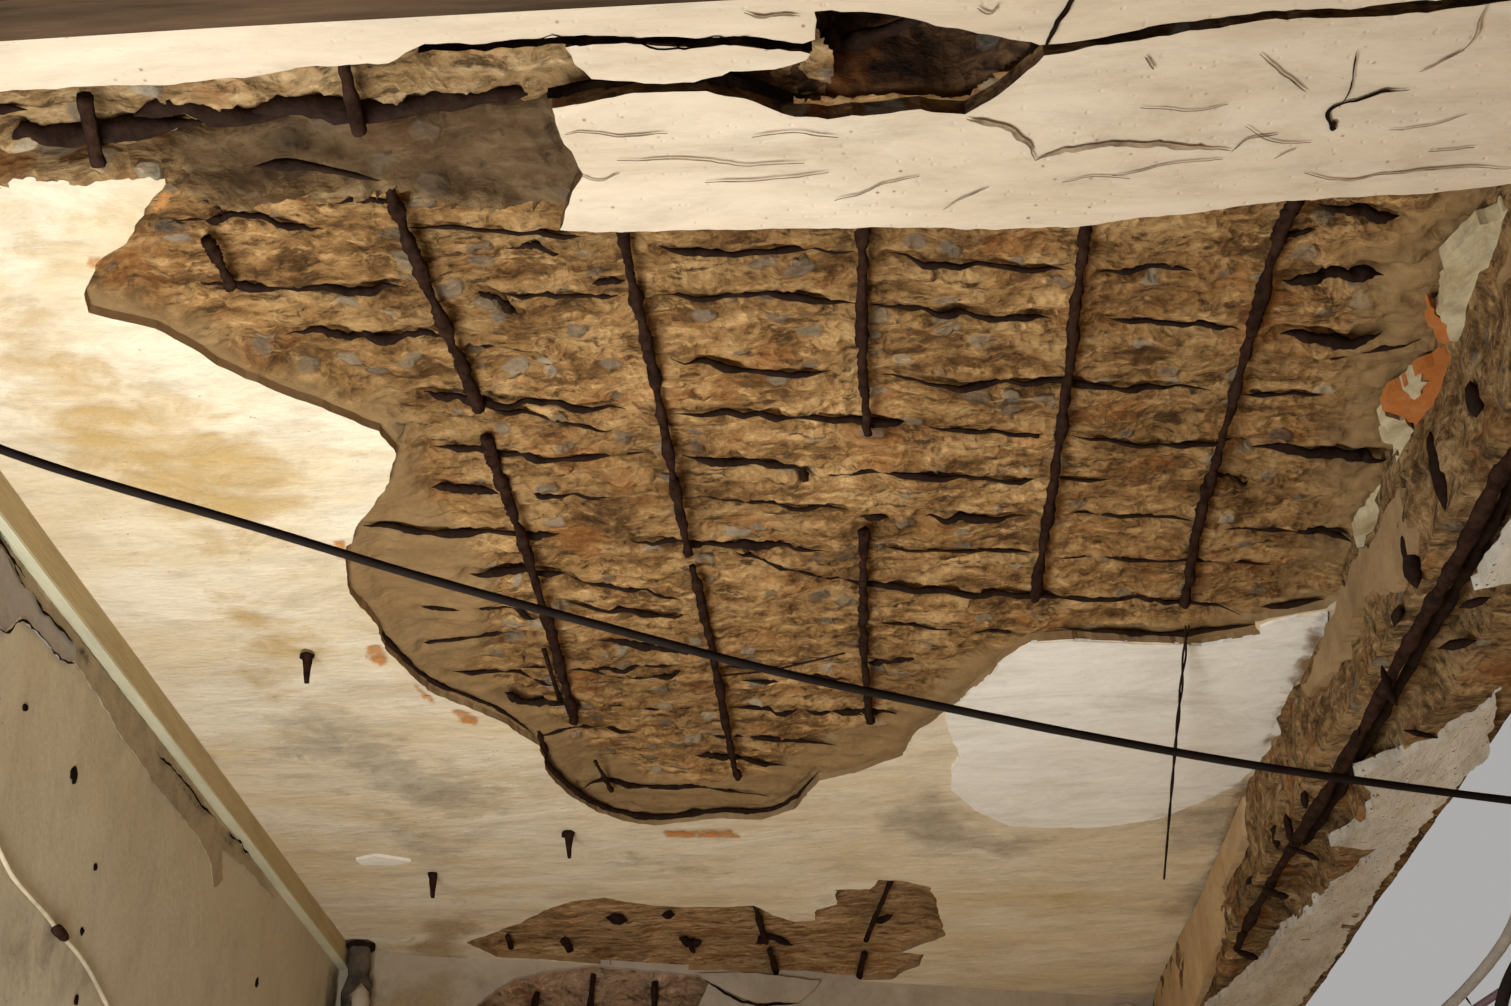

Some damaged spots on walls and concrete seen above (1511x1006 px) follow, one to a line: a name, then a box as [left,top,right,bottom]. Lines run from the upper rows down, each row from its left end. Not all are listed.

spalling [730,10,1031,106]
crack [967,0,1511,183]
crack [943,187,989,210]
spalling [0,44,1508,838]
peeling [0,537,273,898]
spalling [1233,447,1511,960]
spalling [473,880,944,1006]
crack [706,980,800,1006]